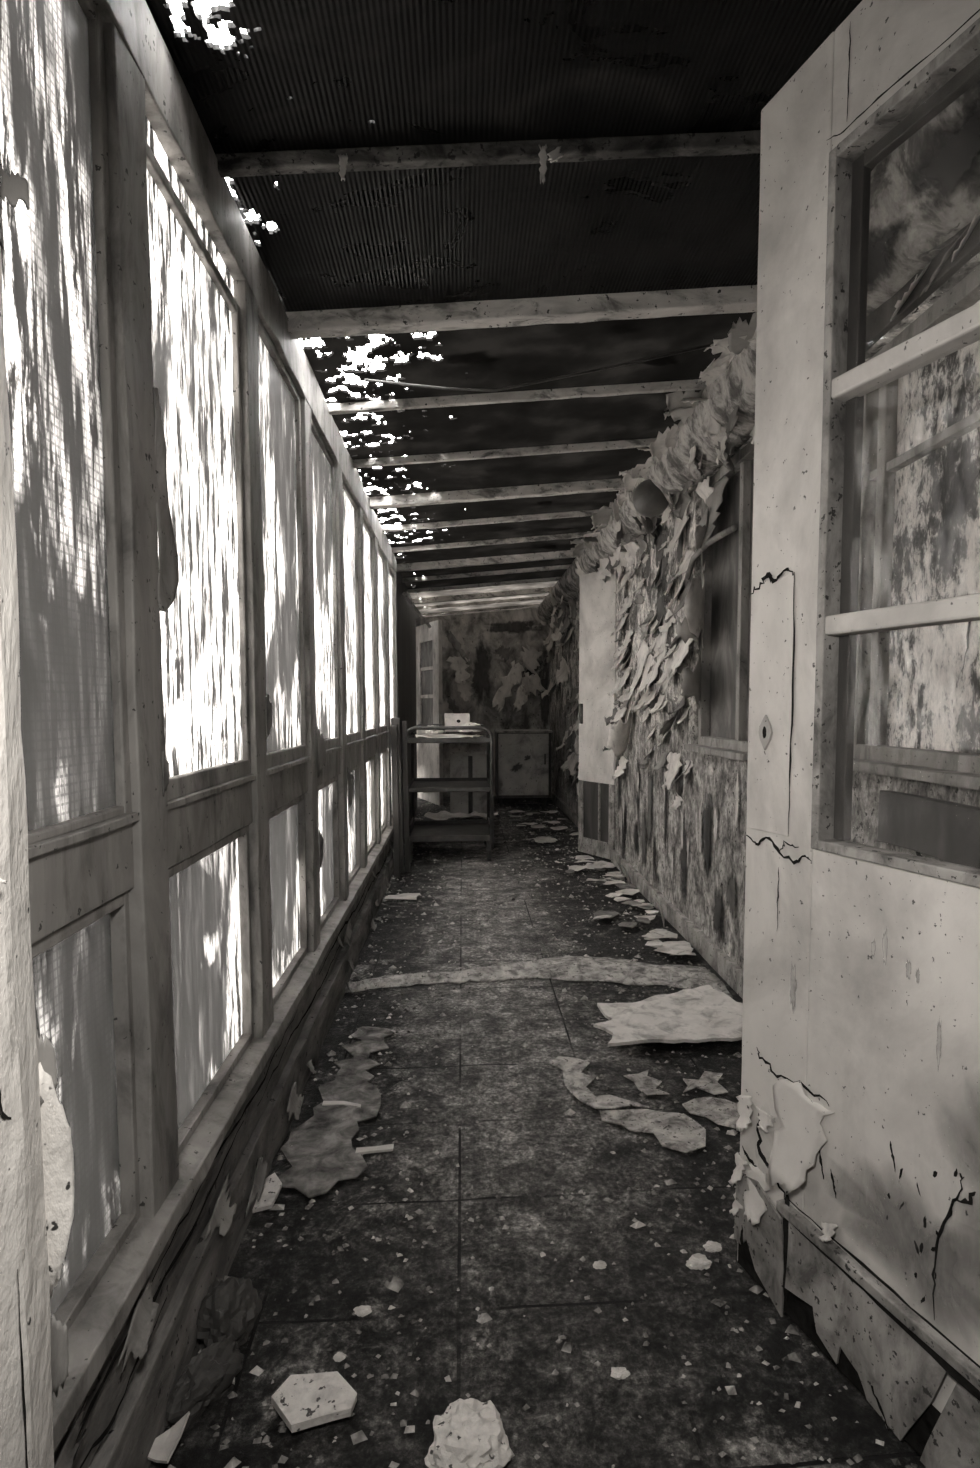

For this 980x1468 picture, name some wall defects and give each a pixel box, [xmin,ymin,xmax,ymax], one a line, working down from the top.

peeling [492,312,757,811]
peeling [446,630,474,713]
crack [746,567,812,928]
peeling [728,1048,836,1226]
peeling [818,1222,838,1242]
spalling [886,1141,963,1220]
spalling [914,1217,938,1278]
crack [931,1177,976,1320]